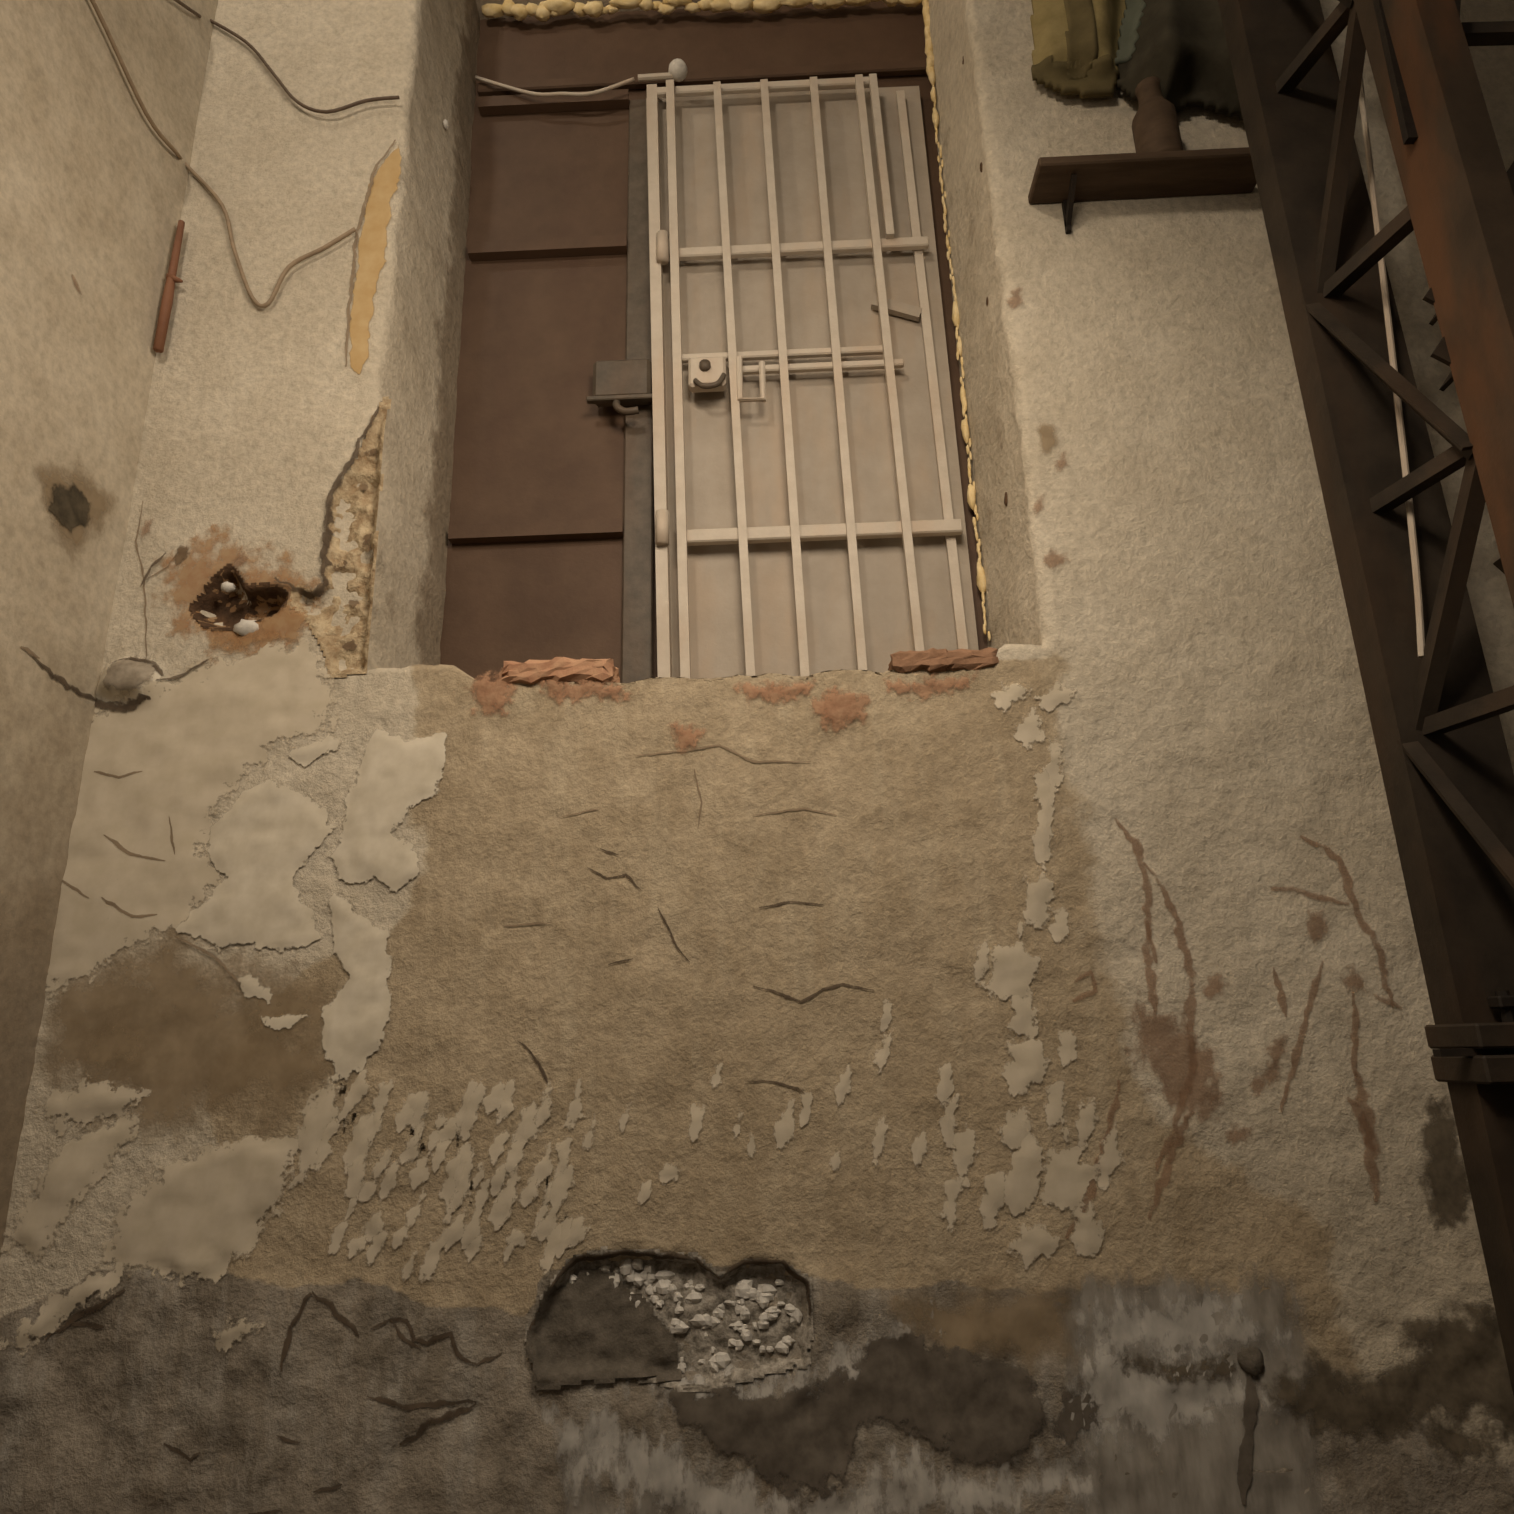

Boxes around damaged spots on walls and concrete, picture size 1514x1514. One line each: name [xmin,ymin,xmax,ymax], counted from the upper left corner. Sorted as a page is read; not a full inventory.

water stain [48,931,329,1126]
peeling [0,396,814,1392]
peeling [873,999,892,1073]
peeling [911,681,1125,1270]
corrosion [1115,818,1222,1220]
corrosion [1253,961,1323,1112]
corrosion [1271,835,1402,1202]
corrosion [1066,1080,1120,1239]
crack [163,1443,200,1462]
crack [249,1506,280,1514]
crack [280,1291,502,1445]
water stain [543,1291,1514,1514]